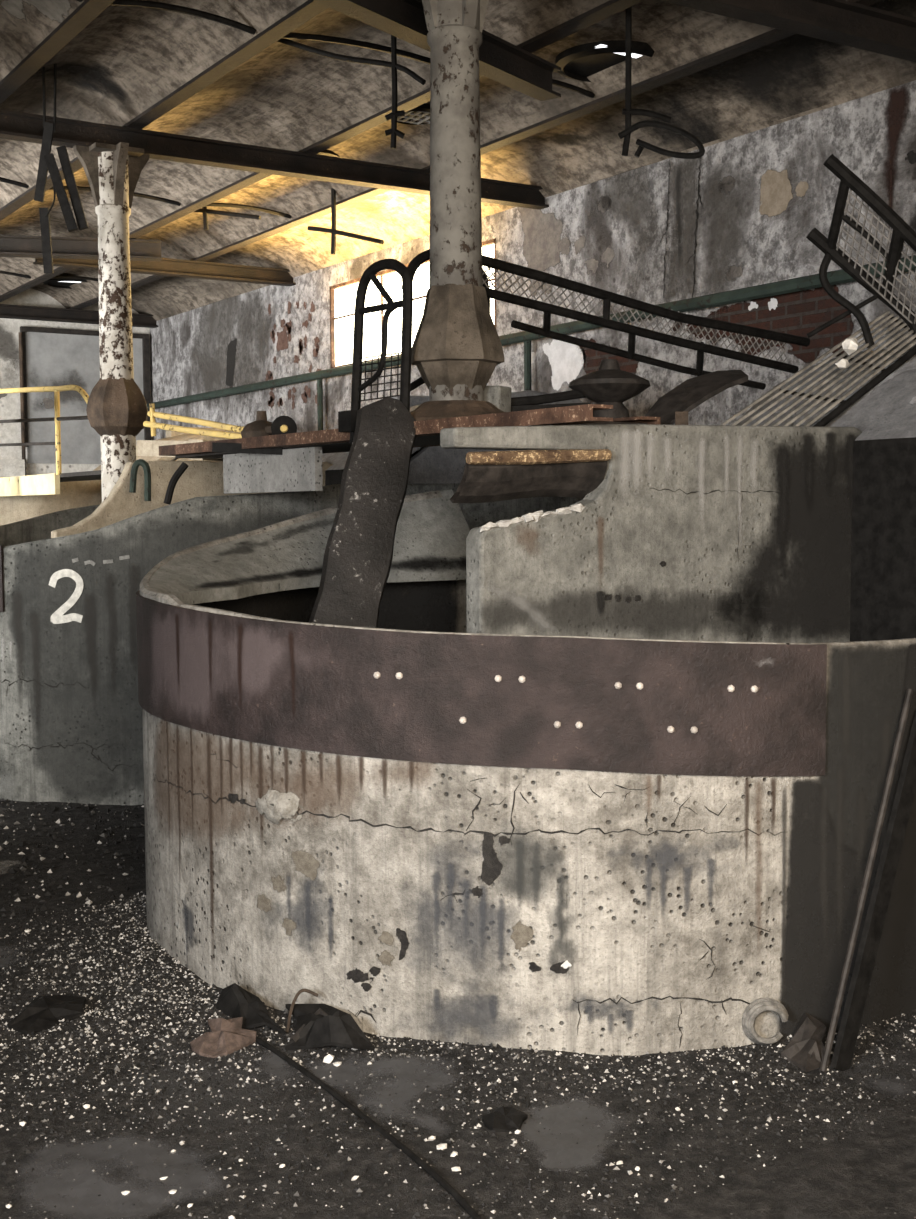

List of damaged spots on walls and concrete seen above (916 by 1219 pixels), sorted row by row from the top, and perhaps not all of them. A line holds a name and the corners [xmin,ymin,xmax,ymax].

peeling [759,169,808,217]
spalling [480,503,585,532]
damp [487,432,916,1039]
crack [297,778,781,845]
spalling [472,832,510,898]
damp [184,908,194,949]
damp [288,877,333,949]
damp [417,836,570,965]
damp [435,990,508,1036]